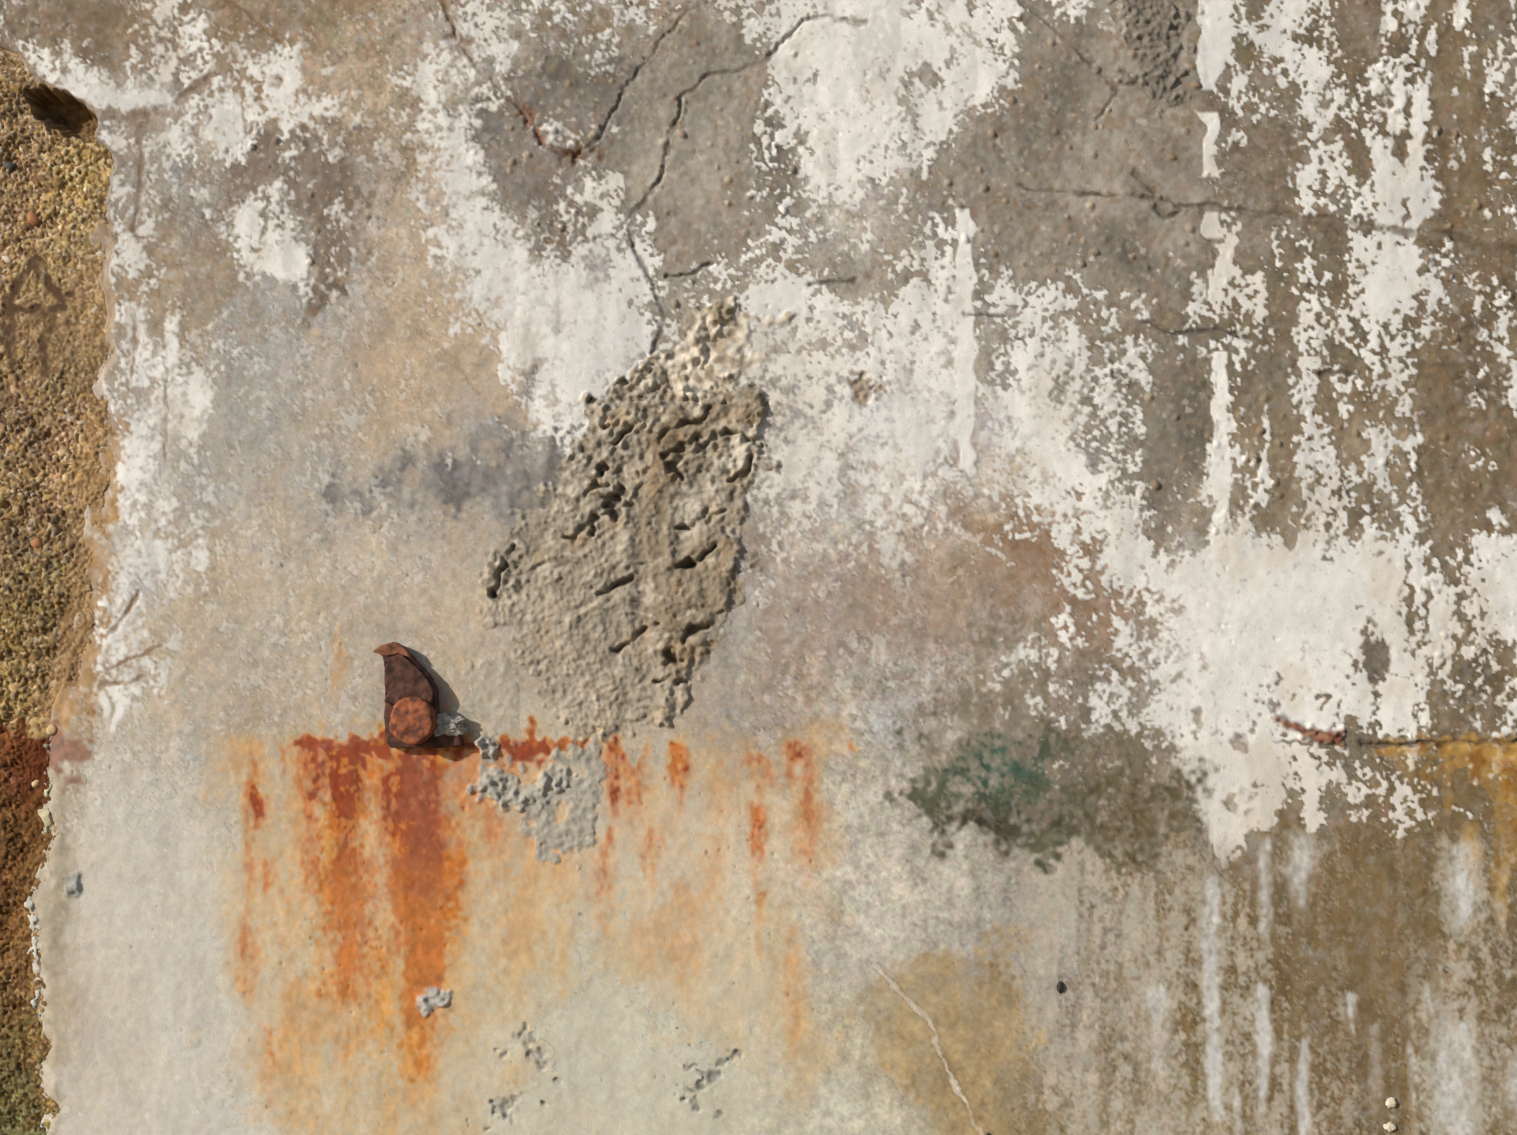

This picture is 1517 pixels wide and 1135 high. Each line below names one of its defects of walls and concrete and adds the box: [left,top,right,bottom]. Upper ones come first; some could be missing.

crack [410,323,484,396]
crack [437,0,697,162]
crack [625,12,872,356]
peeling [0,0,1517,870]
crack [1017,165,1517,257]
rust [0,711,116,1135]
rust [191,614,864,1135]
damp [854,756,1517,1135]